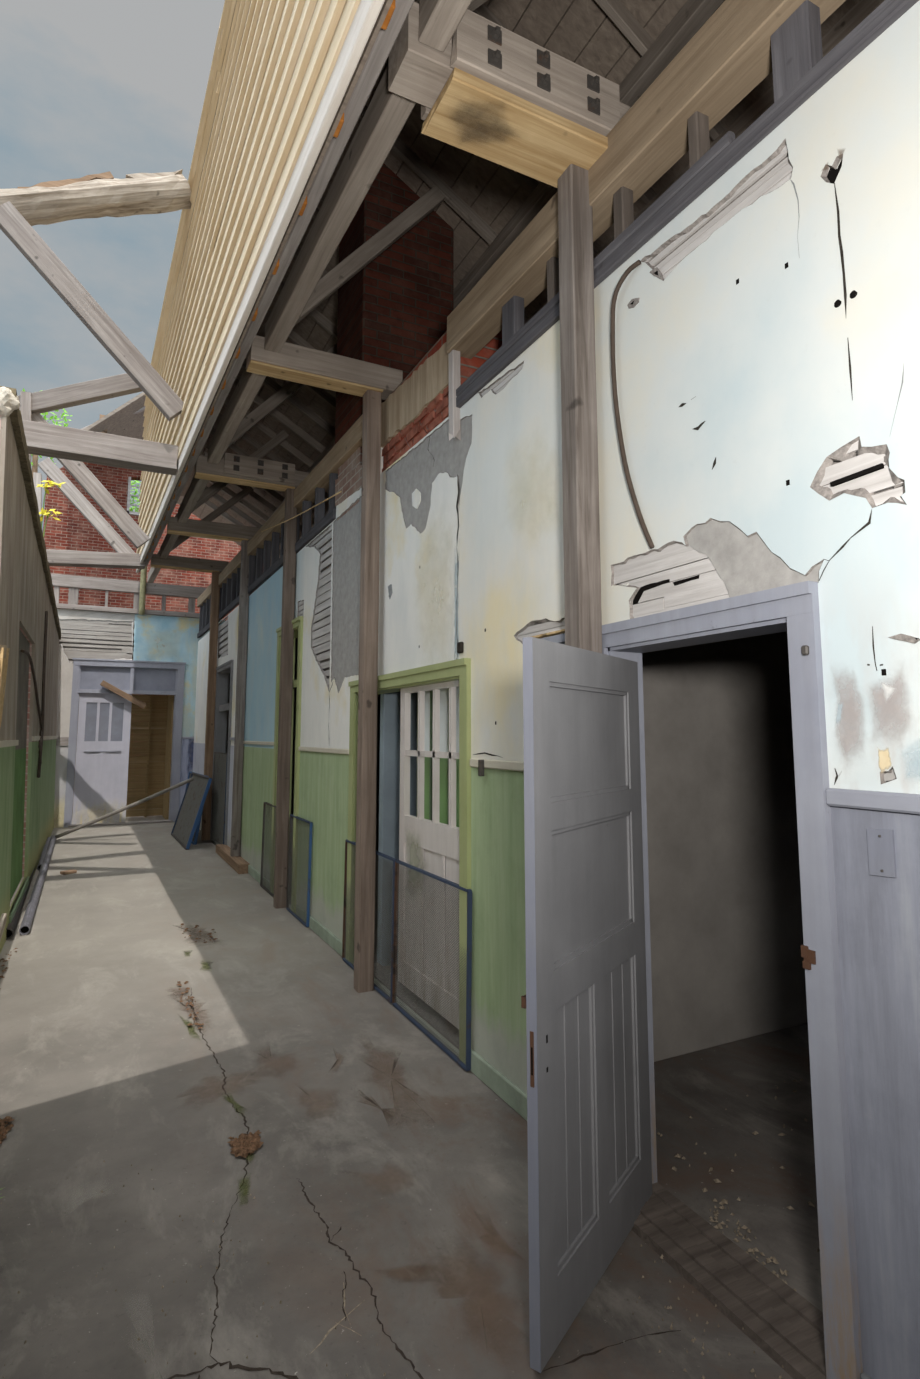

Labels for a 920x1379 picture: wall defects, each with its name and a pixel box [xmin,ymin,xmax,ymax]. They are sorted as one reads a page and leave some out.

spalling [641,139,793,281]
crack [791,180,799,251]
crack [834,182,857,400]
peeling [382,385,472,534]
spalling [810,436,907,508]
spalling [611,518,824,619]
crack [819,510,872,581]
crack [167,988,298,1379]
crack [296,1178,424,1379]
crack [542,1330,681,1372]